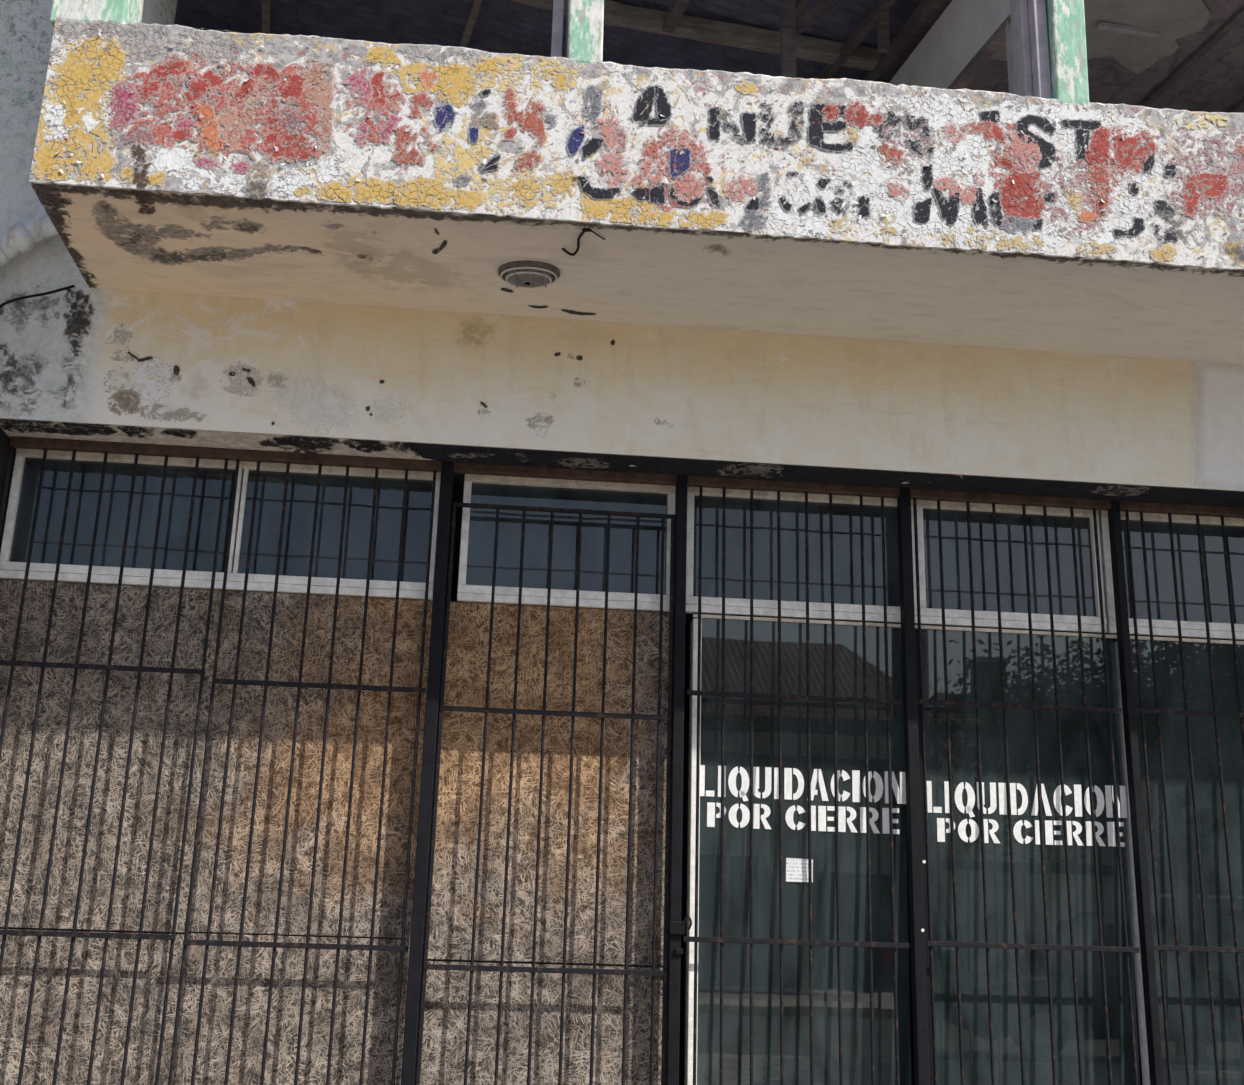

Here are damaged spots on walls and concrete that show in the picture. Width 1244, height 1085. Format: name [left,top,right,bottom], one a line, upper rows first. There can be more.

peeling [12,19,1244,266]
peeling [0,323,207,439]
peeling [220,361,287,396]
water stain [0,183,1244,410]